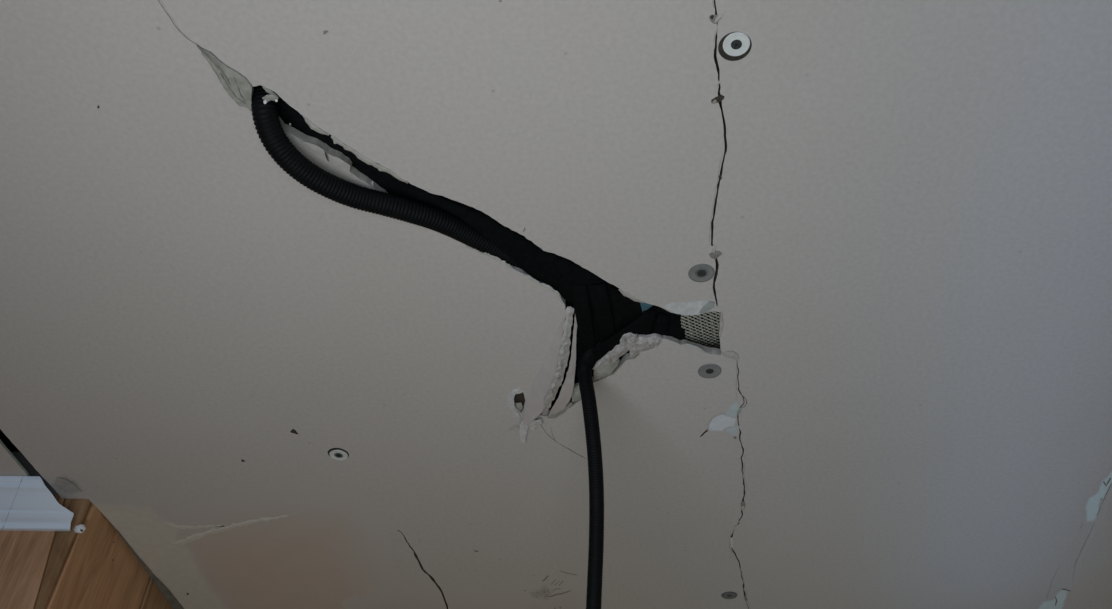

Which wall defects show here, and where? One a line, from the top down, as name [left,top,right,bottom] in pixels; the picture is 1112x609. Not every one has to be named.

crack [158,0,196,44]
crack [709,0,727,304]
peeling [663,300,715,315]
spalling [593,332,662,371]
crack [729,363,751,609]
peeling [1084,468,1112,523]
crack [398,530,448,609]